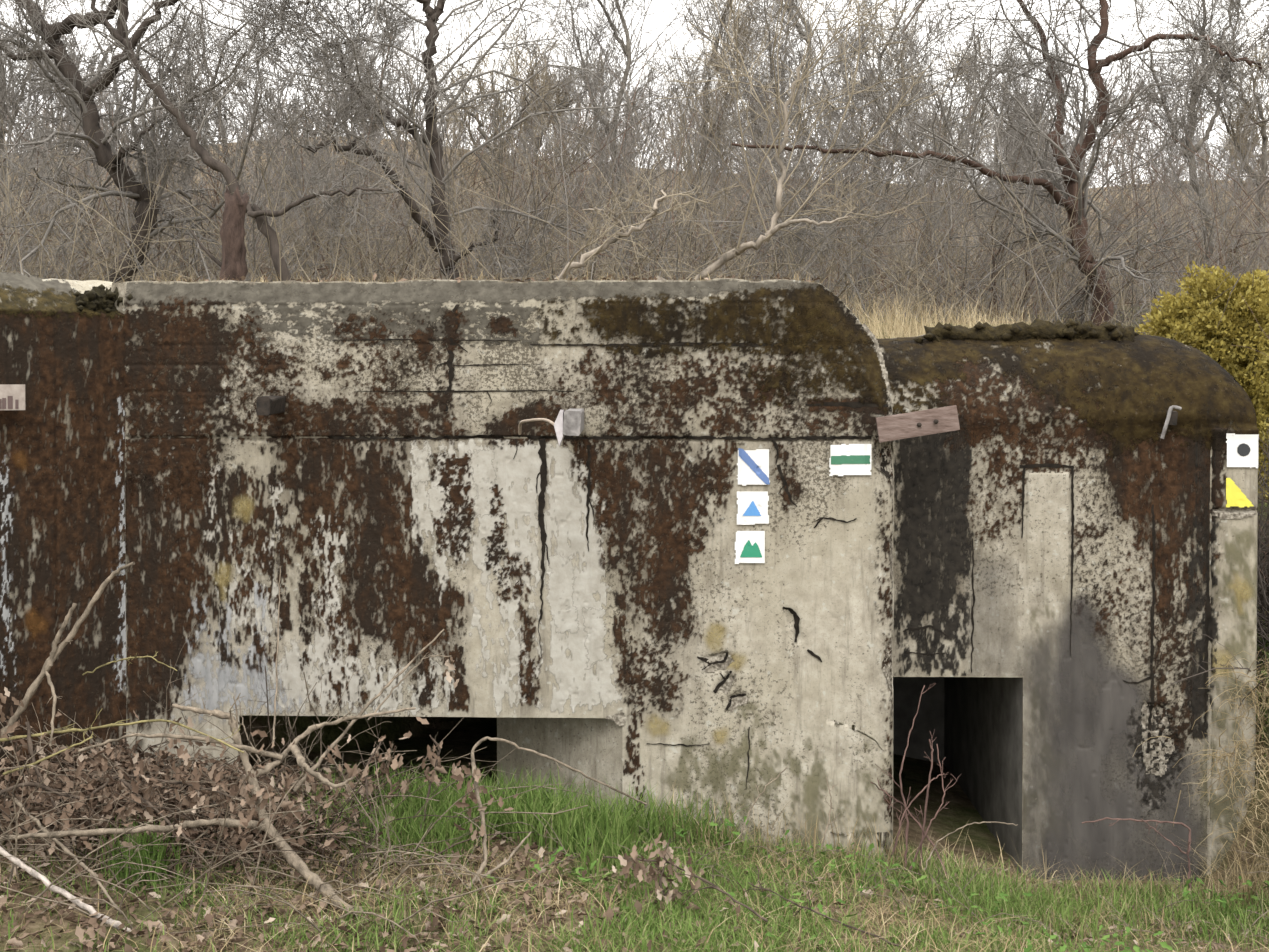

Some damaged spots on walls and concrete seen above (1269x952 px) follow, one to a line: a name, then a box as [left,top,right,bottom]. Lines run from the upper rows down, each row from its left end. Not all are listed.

leakage [0,460,16,686]
leakage [112,397,126,692]
leakage [612,591,646,811]
spalling [704,651,748,712]
leakage [1026,438,1219,883]